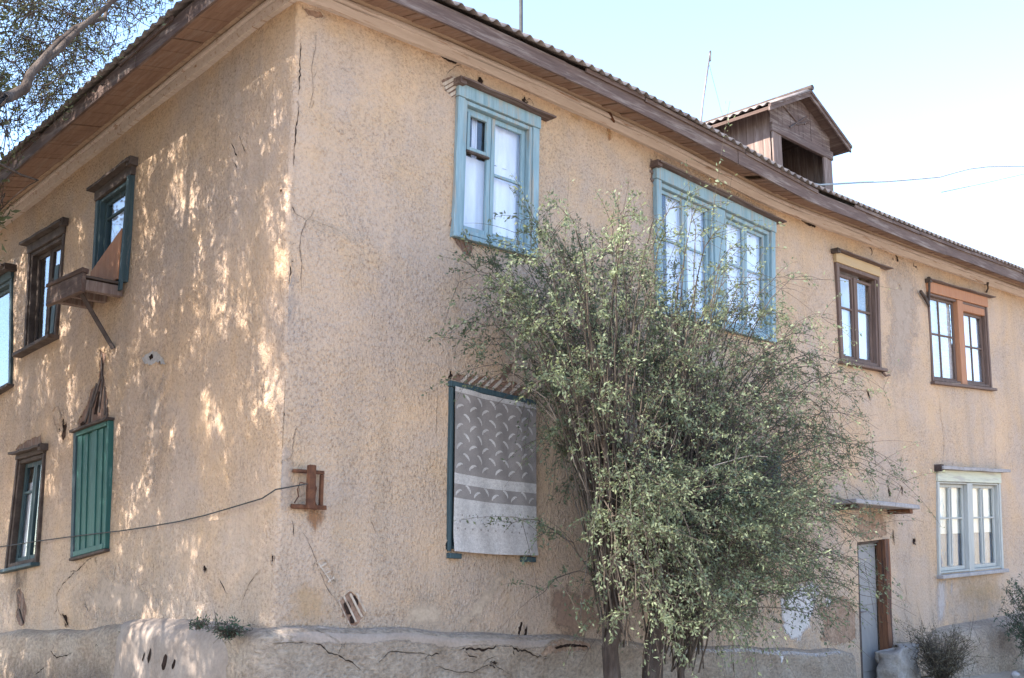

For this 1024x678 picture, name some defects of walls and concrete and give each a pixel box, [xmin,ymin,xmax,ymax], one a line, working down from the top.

crack [289,32,342,293]
crack [291,520,338,602]
crack [273,614,547,676]